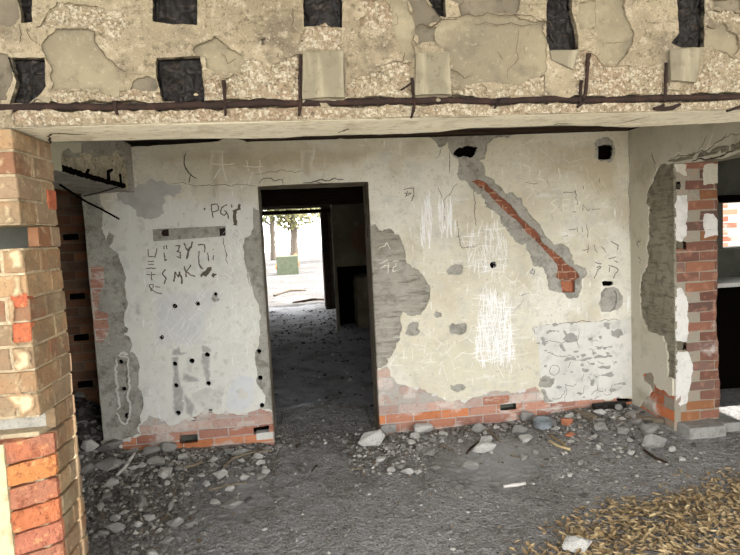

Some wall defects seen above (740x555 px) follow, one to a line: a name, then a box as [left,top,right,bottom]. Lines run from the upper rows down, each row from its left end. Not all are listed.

spalling [0,53,18,100]
spalling [0,0,23,27]
spalling [11,0,740,126]
peeling [61,149,181,219]
spalling [63,194,275,450]
peeling [349,222,632,434]
spalling [429,135,586,299]
spalling [640,141,740,379]
crack [651,133,740,172]
flaking render [640,372,681,431]